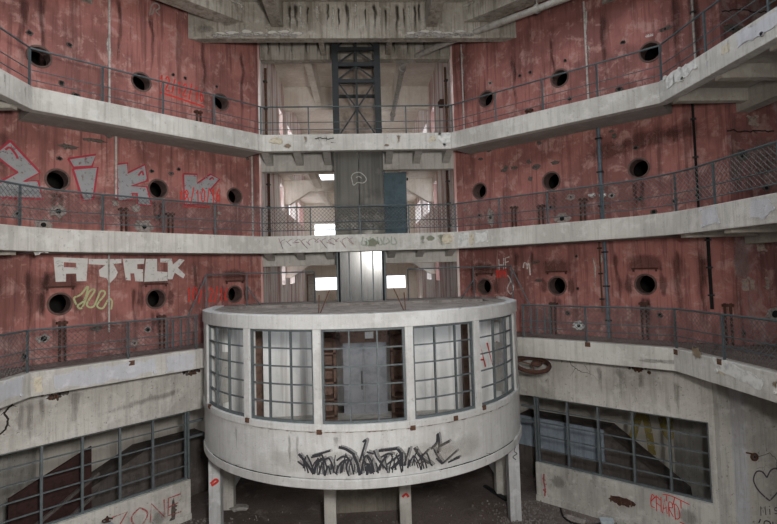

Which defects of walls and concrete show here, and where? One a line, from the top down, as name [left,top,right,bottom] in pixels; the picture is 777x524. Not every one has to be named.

damp [215,4,466,51]
peeling [712,356,765,390]
crack [0,404,17,435]